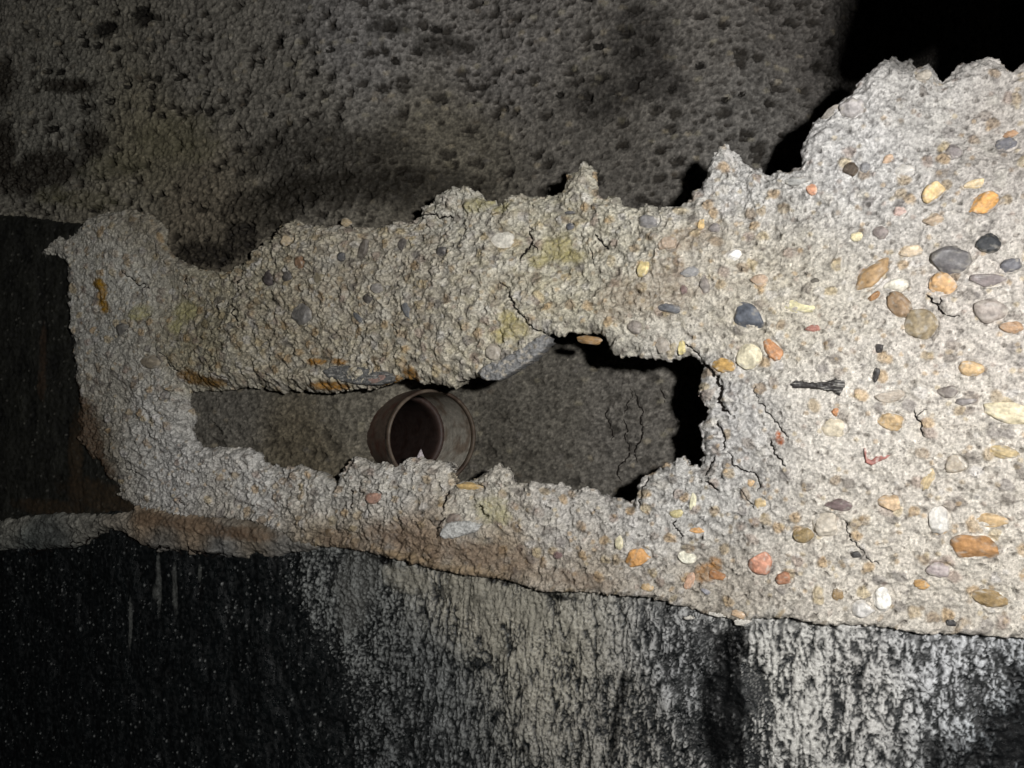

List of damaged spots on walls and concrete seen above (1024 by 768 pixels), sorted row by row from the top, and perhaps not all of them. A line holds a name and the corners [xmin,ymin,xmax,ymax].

leakage [46,78,96,93]
leakage [0,123,107,196]
leakage [177,130,488,267]
crack [519,227,538,259]
rust [93,279,108,312]
crack [500,282,549,334]
crack [926,294,959,317]
spalling [43,56,1024,639]
crack [605,389,666,506]
crack [685,344,761,509]
crack [753,386,787,466]